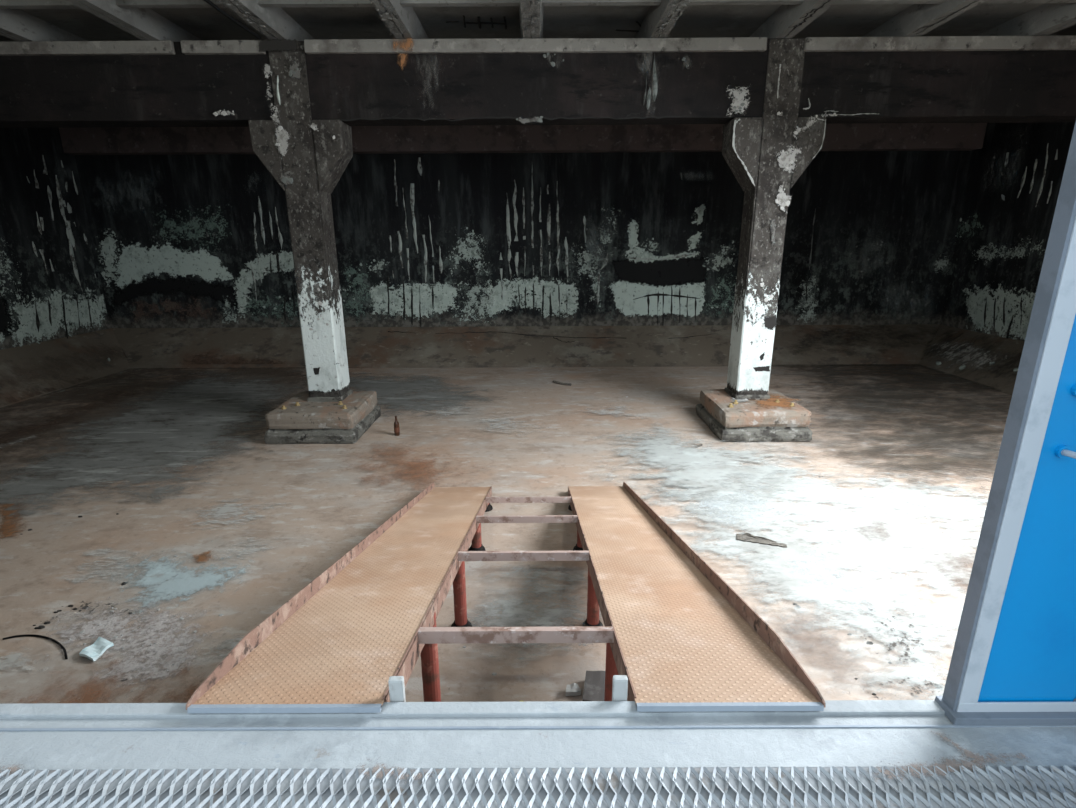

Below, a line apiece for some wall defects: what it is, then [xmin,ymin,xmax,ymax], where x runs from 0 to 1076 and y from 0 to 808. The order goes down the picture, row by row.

rust [393,38,413,68]
spalling [775,112,837,173]
leakage [0,298,19,336]
leakage [26,155,88,291]
leakage [111,276,237,325]
peeling [0,196,580,392]
leakage [389,157,443,282]
leakage [499,165,708,307]
peeling [608,204,780,402]
spalling [770,185,792,245]
peeling [795,208,819,323]
leakage [608,329,1021,700]